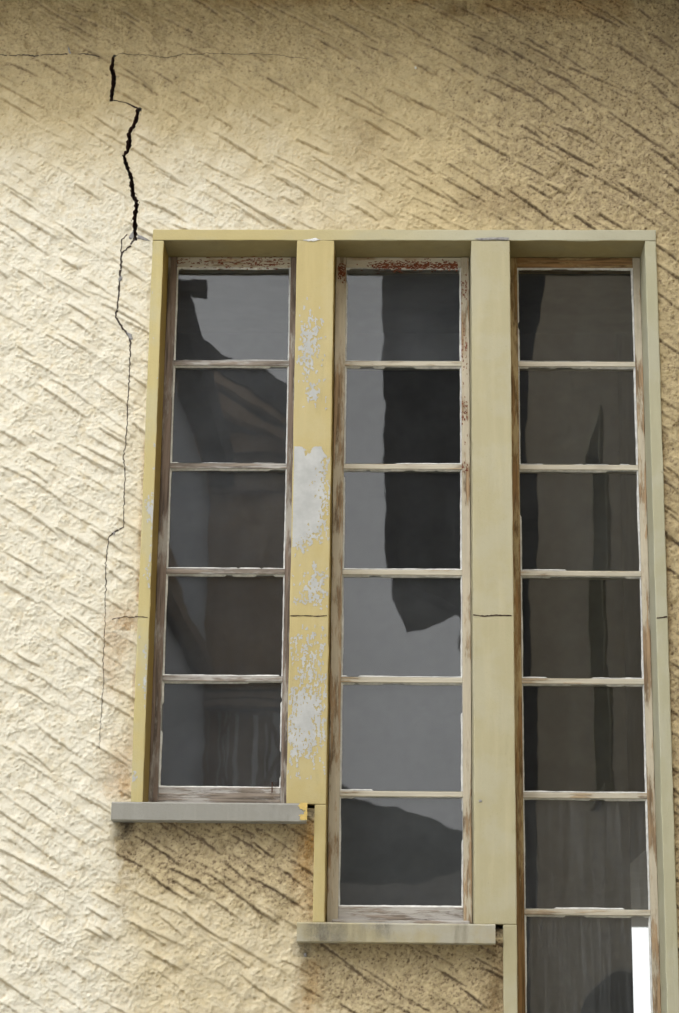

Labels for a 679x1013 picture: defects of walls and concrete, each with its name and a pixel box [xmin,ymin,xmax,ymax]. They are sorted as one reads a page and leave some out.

crack [0,47,304,749]
peeling [296,297,327,410]
peeling [292,446,330,610]
peeling [287,624,327,779]